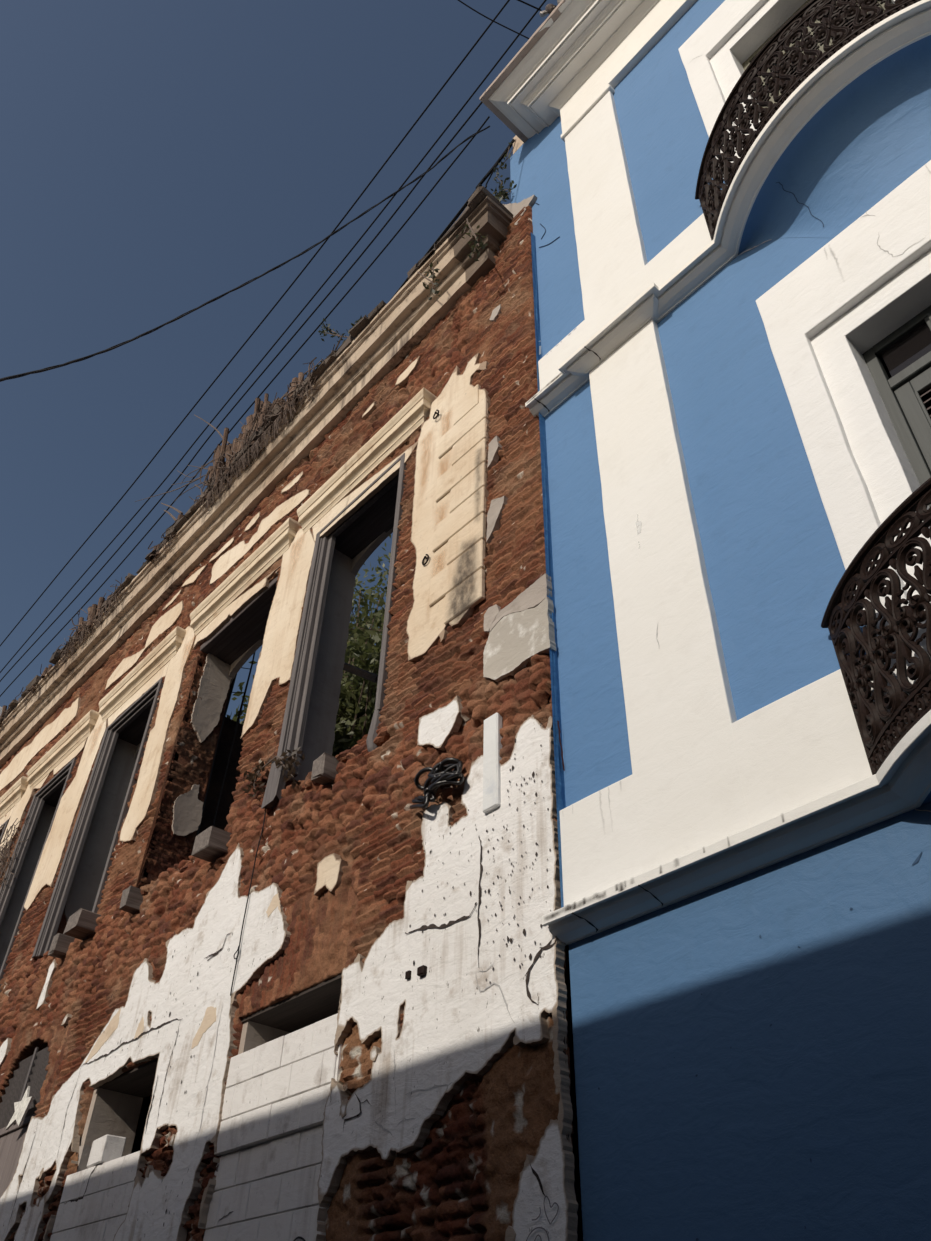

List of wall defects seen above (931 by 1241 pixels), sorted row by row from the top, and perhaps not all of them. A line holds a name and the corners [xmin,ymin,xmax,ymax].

crack [776,182,824,227]
crack [860,213,924,257]
flaking render [105,471,311,691]
flaking render [483,598,556,682]
flaking render [0,697,81,791]
flaking render [190,653,232,743]
flaking render [417,696,463,751]
flaking render [171,784,203,837]
flaking render [314,853,347,897]
flaking render [36,959,58,1011]
flaking render [0,1038,12,1069]
flaking render [325,1013,560,1241]